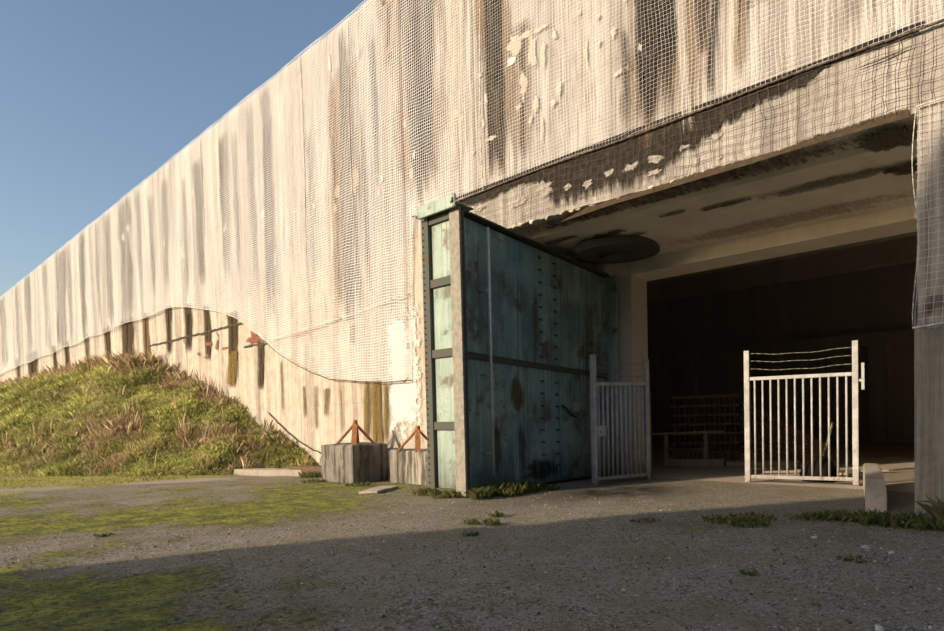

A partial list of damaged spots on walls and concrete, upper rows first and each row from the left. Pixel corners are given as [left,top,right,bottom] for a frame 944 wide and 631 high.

peeling [506,23,561,142]
water stain [329,0,926,344]
water stain [226,313,238,387]
water stain [363,379,388,443]